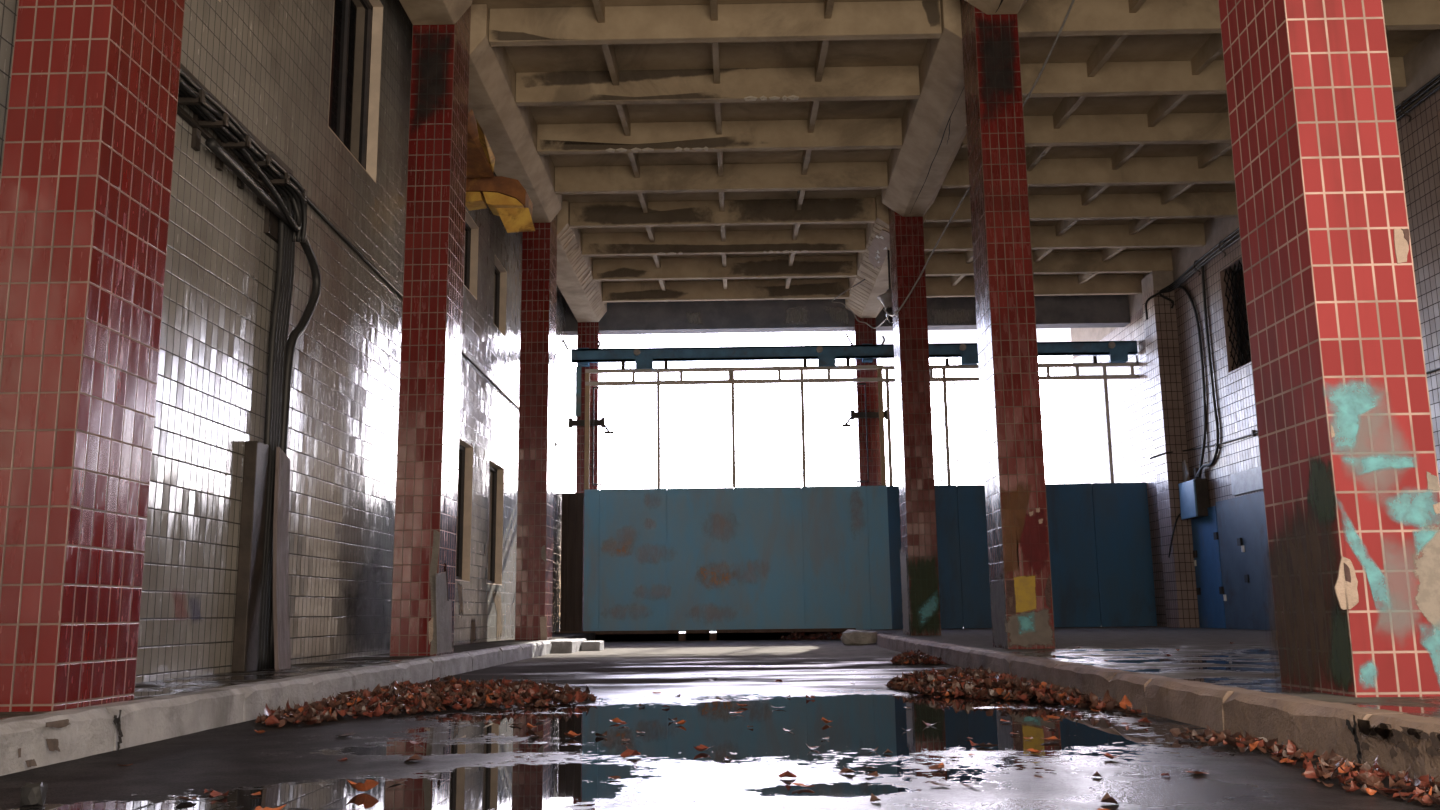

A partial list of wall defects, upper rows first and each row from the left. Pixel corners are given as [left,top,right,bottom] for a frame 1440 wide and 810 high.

peeling [1427,472,1440,515]
spalling [1334,556,1359,610]